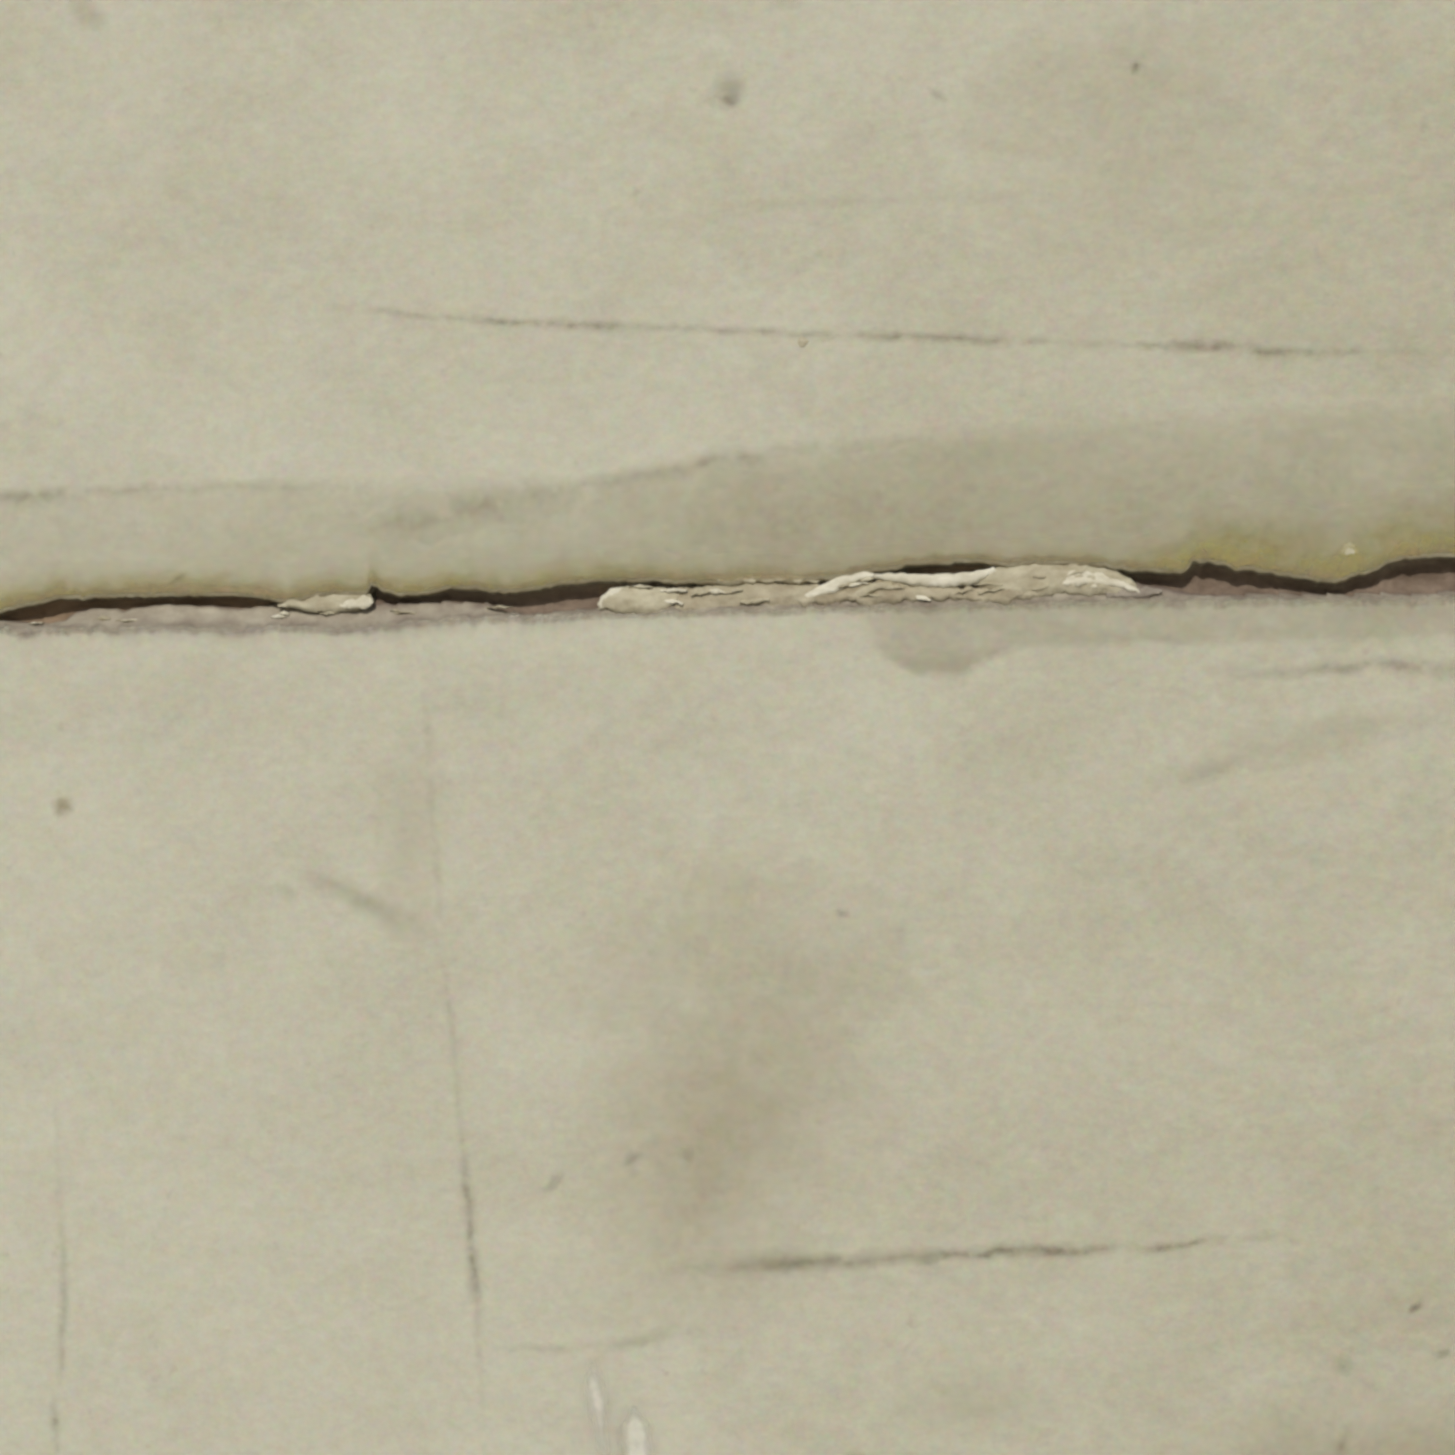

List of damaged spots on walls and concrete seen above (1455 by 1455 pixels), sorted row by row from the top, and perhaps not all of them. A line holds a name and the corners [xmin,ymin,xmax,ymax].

peeling [277,593,374,613]
crack [0,550,1455,632]
peeling [597,564,1162,615]